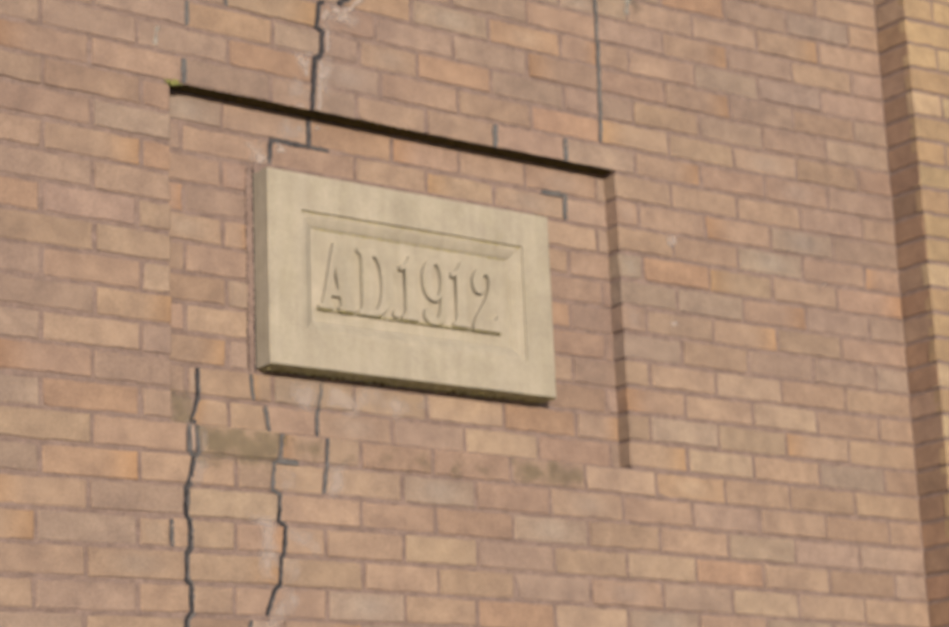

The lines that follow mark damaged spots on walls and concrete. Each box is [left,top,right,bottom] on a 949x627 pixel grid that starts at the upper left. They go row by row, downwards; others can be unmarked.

crack [179,58,187,83]
crack [183,0,191,25]
crack [593,0,603,142]
crack [244,0,363,627]
crack [169,368,201,627]